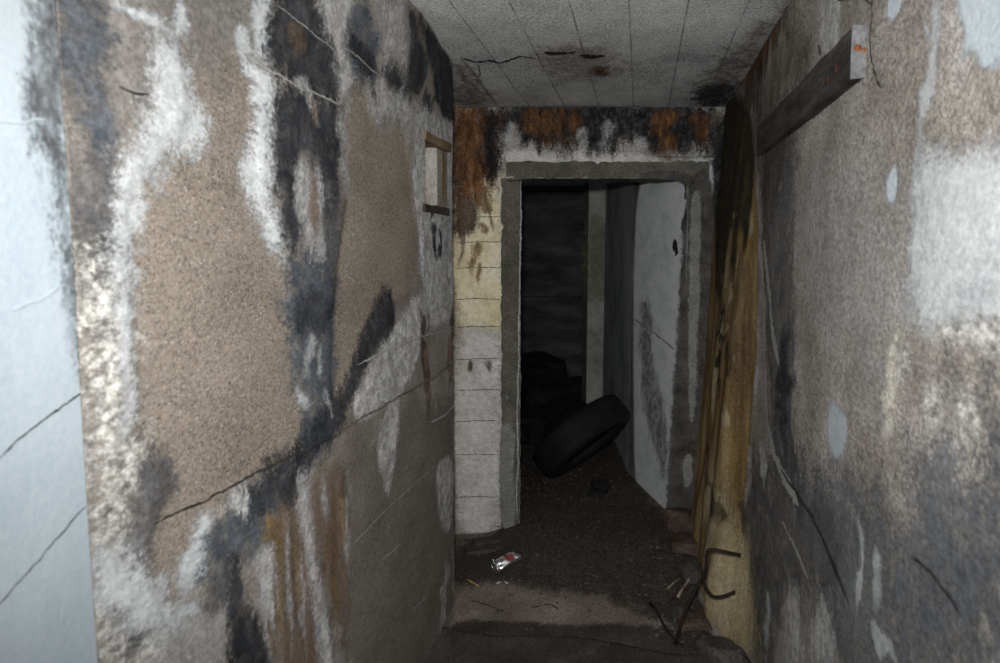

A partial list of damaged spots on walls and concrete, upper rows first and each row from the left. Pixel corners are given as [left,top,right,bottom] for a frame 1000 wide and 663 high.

damp [818,0,841,56]
crack [460,56,536,105]
damp [234,0,487,372]
rust [452,107,506,280]
crack [155,179,522,524]
damp [420,312,431,393]
damp [641,23,1000,663]
crack [0,393,81,458]
damp [295,389,333,466]
crack [757,237,849,604]
crack [0,506,86,603]
crack [913,558,961,616]